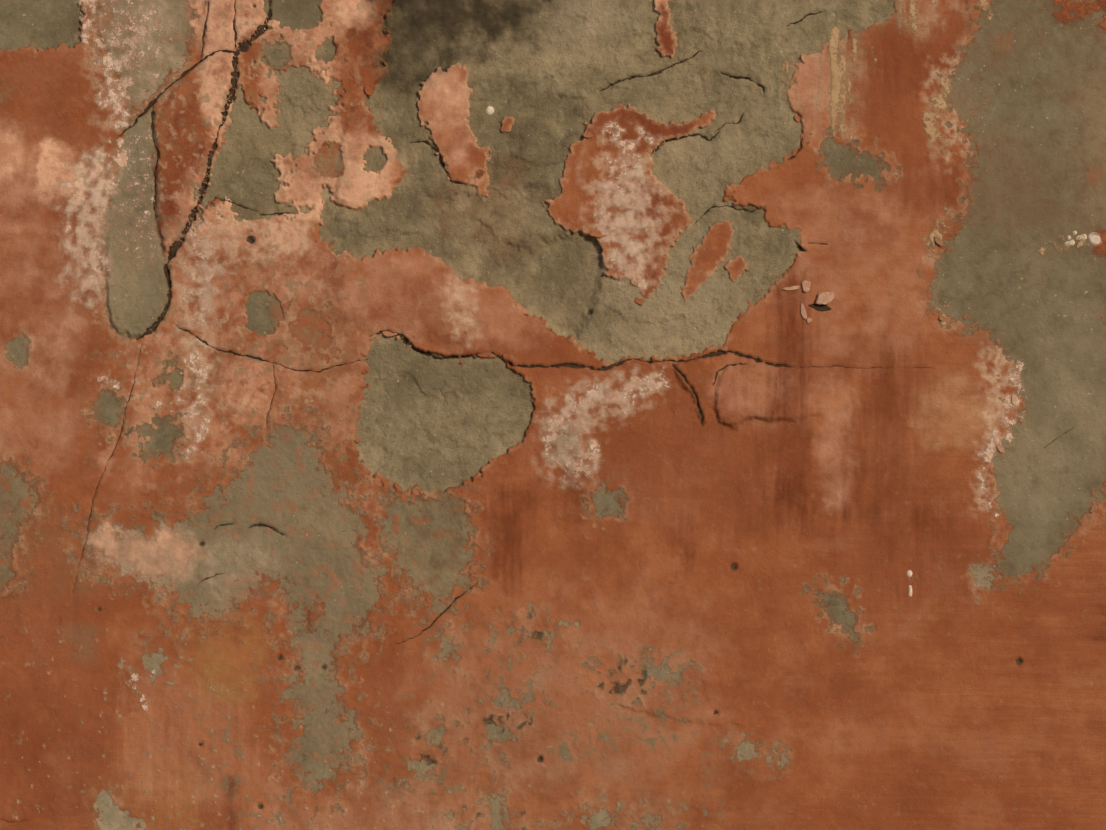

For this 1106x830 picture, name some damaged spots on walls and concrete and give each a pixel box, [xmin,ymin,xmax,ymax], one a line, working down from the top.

flaking render [184,0,902,364]
crack [73,0,934,591]
flaking render [917,0,1106,603]
peeling [0,450,54,601]
peeling [59,331,588,830]
peeling [385,671,688,830]
peeling [578,479,630,521]
efflorescence [542,367,670,488]
peeling [575,645,702,708]
peeling [719,732,793,771]
peeling [802,575,875,655]
efflorescence [977,360,1029,517]